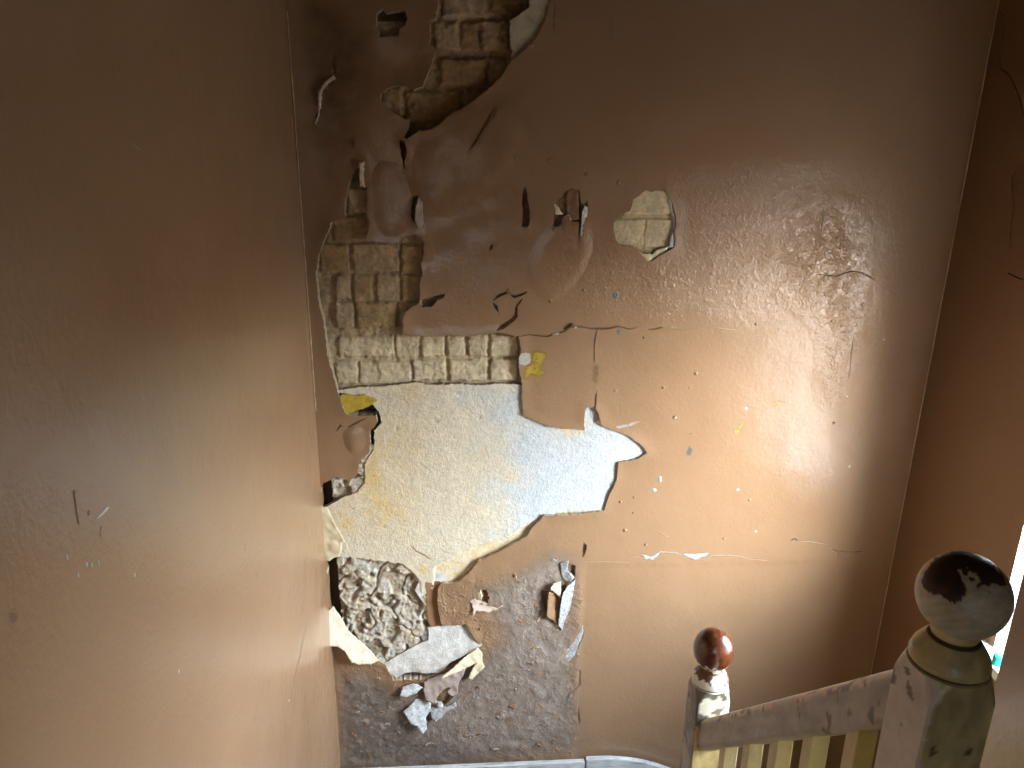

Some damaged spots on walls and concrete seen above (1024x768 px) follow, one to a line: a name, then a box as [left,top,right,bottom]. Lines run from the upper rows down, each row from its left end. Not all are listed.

spalling [377,11,407,37]
spalling [382,0,549,139]
spalling [613,190,676,261]
crack [522,325,661,358]
flaking render [318,161,646,703]